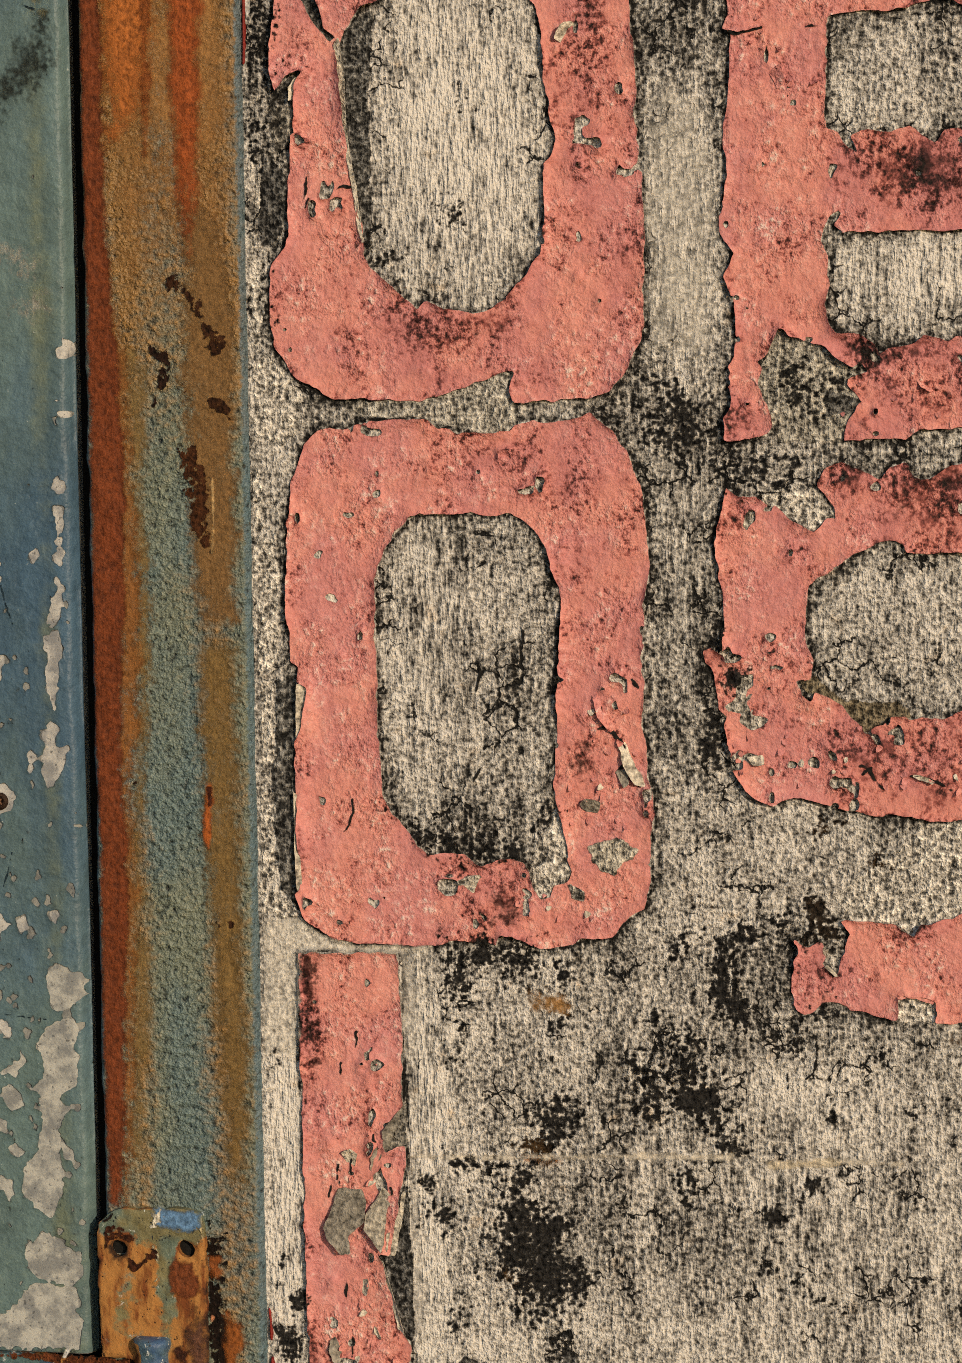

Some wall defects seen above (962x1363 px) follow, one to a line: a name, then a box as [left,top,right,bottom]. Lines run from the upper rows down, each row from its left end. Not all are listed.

peeling [301,0,373,250]
peeling [27,476,69,789]
corrosion [79,0,252,1363]
peeling [246,70,303,446]
peeling [743,489,836,531]
peeling [758,329,861,443]
leakage [800,815,847,847]
peeling [832,822,962,937]
peeling [0,963,89,1358]
peeling [323,1103,415,1363]
leakage [409,889,918,1363]
leakage [912,1270,962,1317]